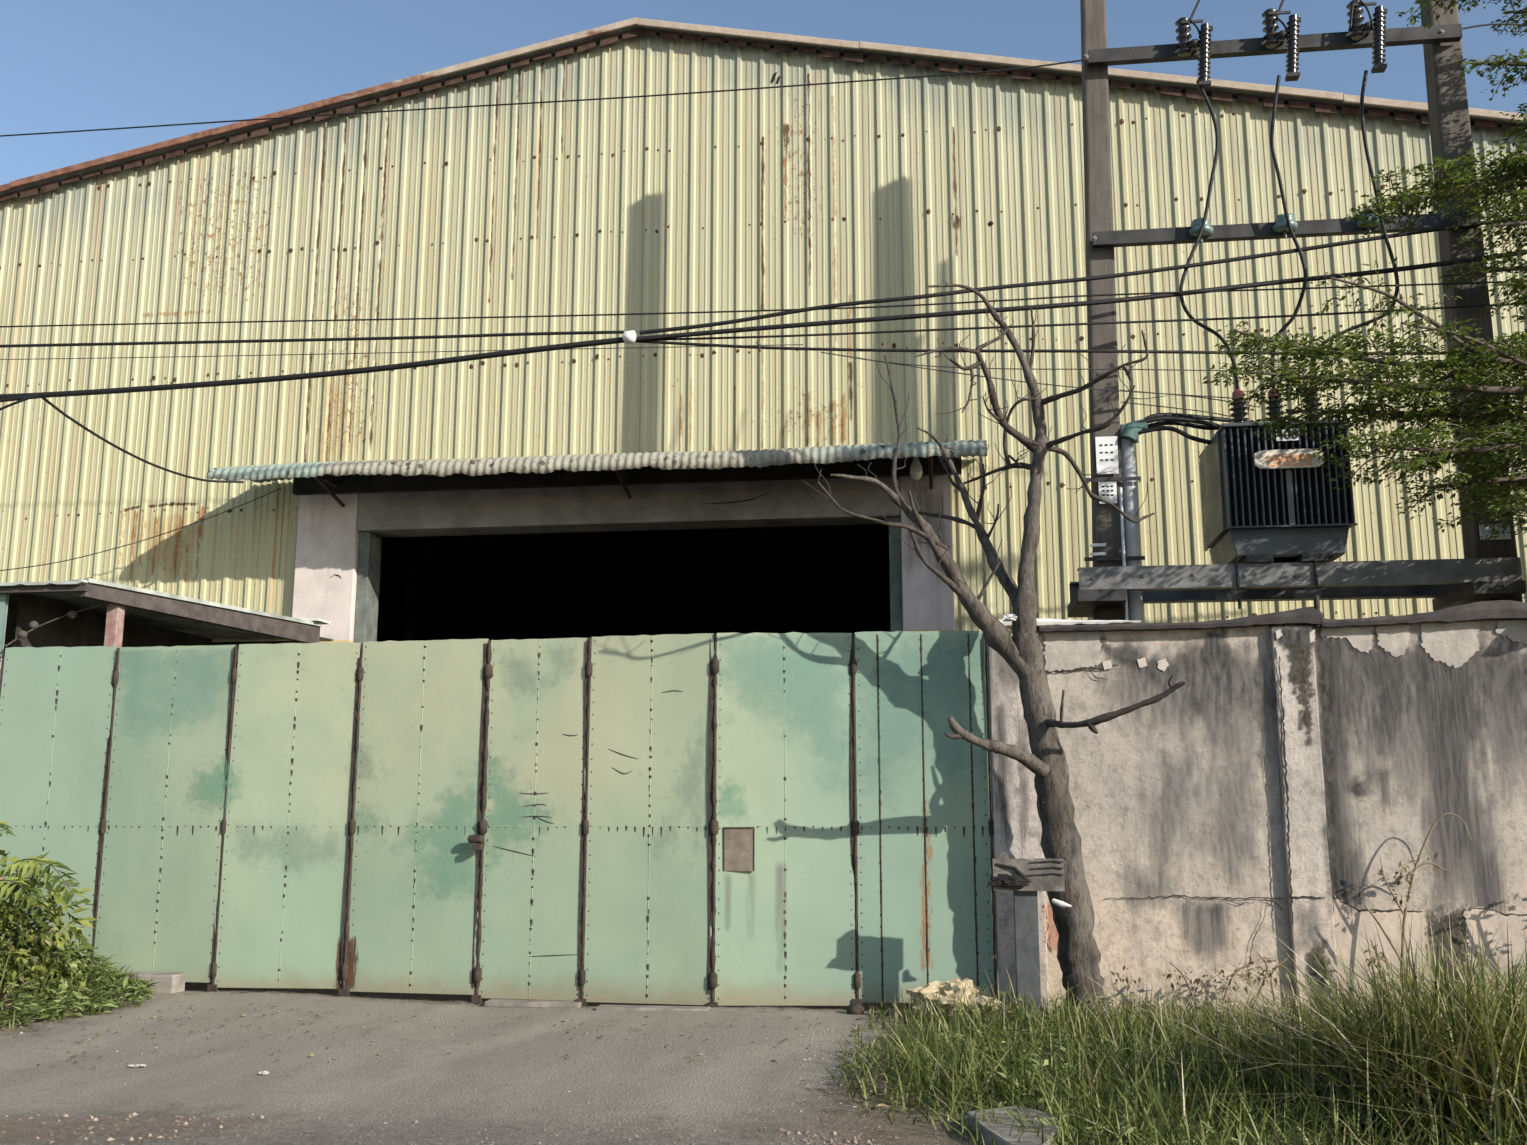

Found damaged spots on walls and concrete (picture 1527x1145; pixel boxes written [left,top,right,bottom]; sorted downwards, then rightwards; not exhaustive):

rust [304,109,398,463]
rust [753,74,862,448]
rust [120,502,205,587]
flaking render [1043,631,1113,672]
flaking render [1137,657,1169,672]
damp [1100,628,1278,749]
flaking render [1275,629,1283,658]
flaking render [1310,620,1527,668]
damp [1300,630,1527,913]
crack [1106,656,1423,978]
crack [1464,908,1527,916]
rust [336,936,358,991]